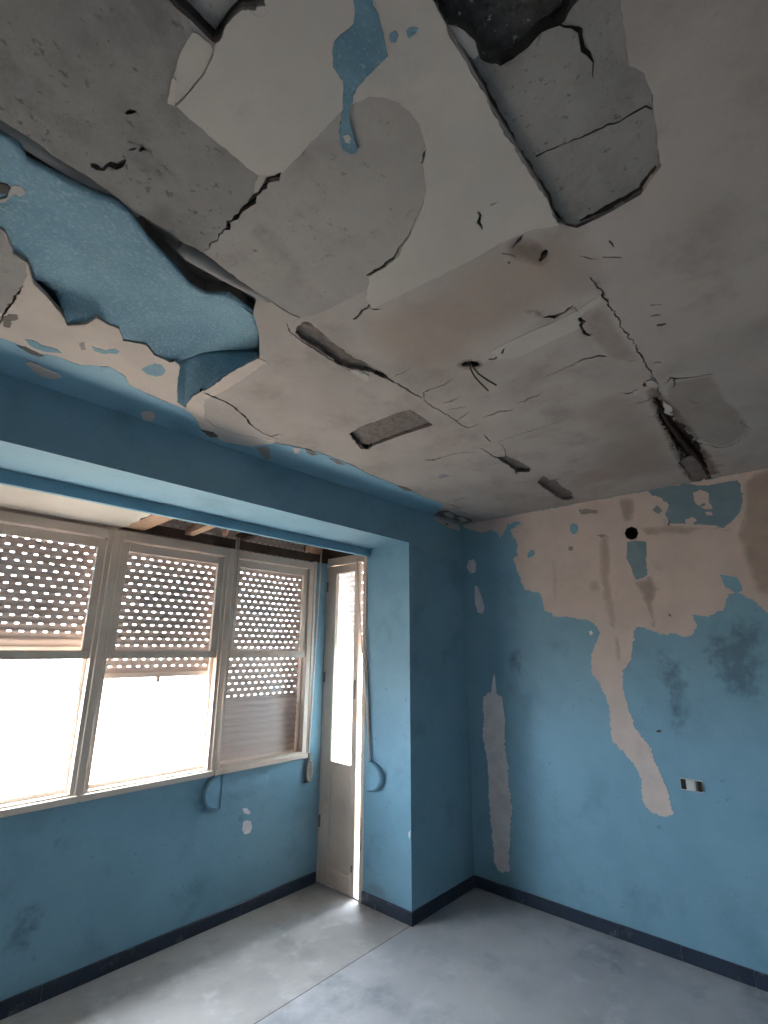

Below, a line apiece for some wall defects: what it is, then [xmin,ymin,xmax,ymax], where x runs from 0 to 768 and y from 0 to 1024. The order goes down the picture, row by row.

crack [205,172,281,250]
crack [581,241,711,395]
peeling [0,0,768,817]
peeling [238,808,252,834]
peeling [482,675,512,873]